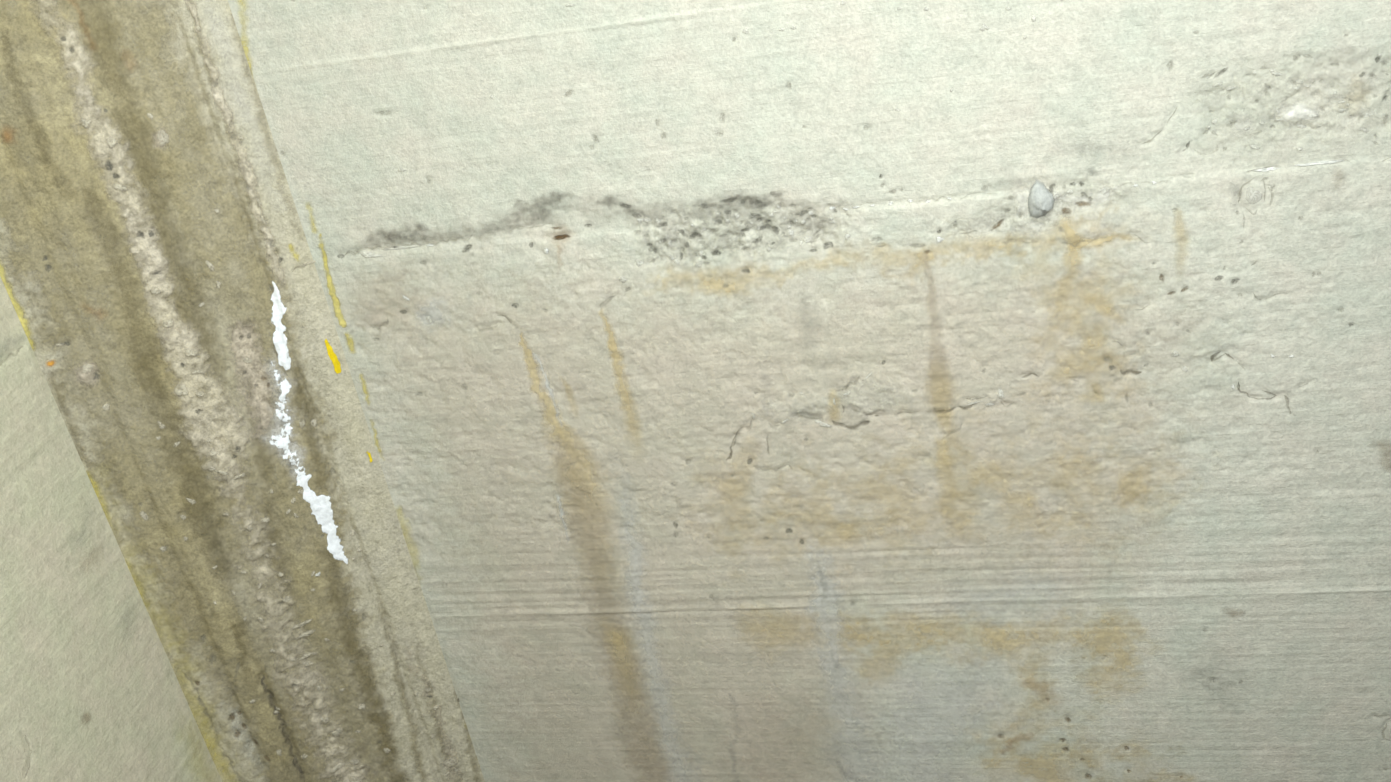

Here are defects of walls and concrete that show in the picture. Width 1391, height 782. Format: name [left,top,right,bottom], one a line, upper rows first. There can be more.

damp [0,0,403,782]
spalling [37,0,367,782]